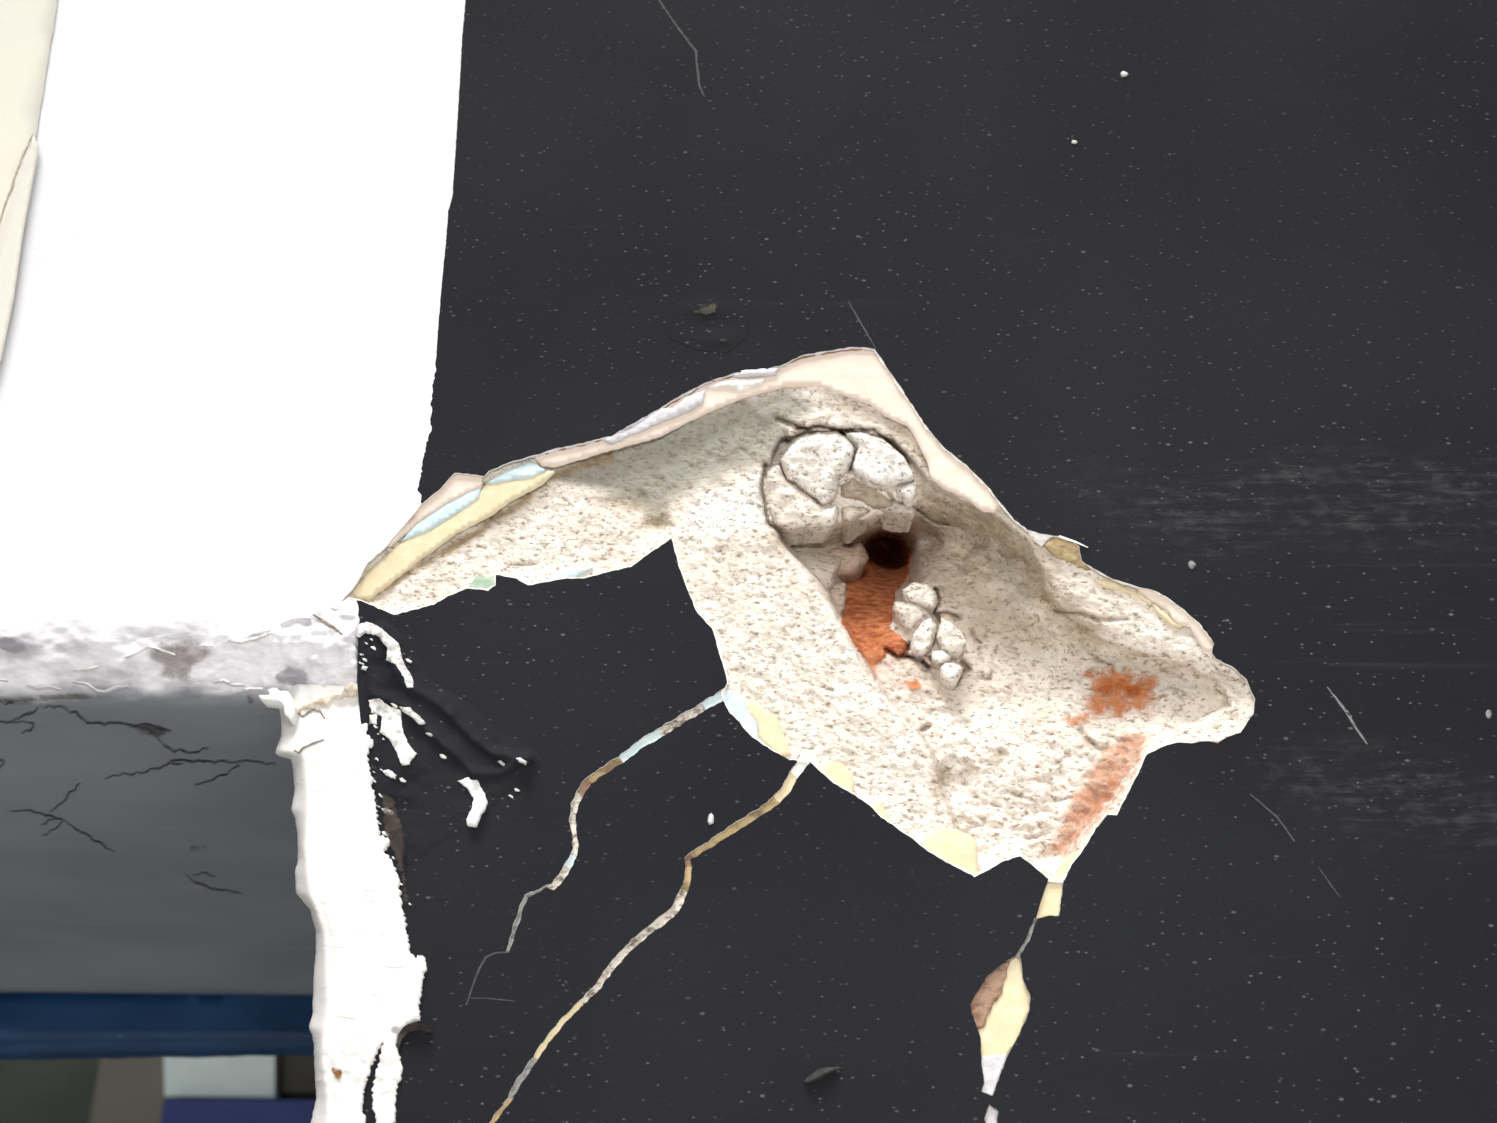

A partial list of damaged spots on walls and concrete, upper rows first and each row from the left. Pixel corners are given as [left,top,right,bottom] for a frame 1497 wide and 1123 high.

damp [0,638,26,653]
damp [151,643,206,678]
damp [276,668,306,685]
flaking render [202,347,1254,883]
corrosion [1067,668,1156,725]
crack [0,701,276,852]
crack [185,846,236,893]
crack [465,690,730,1005]
corrosion [1054,734,1145,853]
crack [491,754,810,1123]